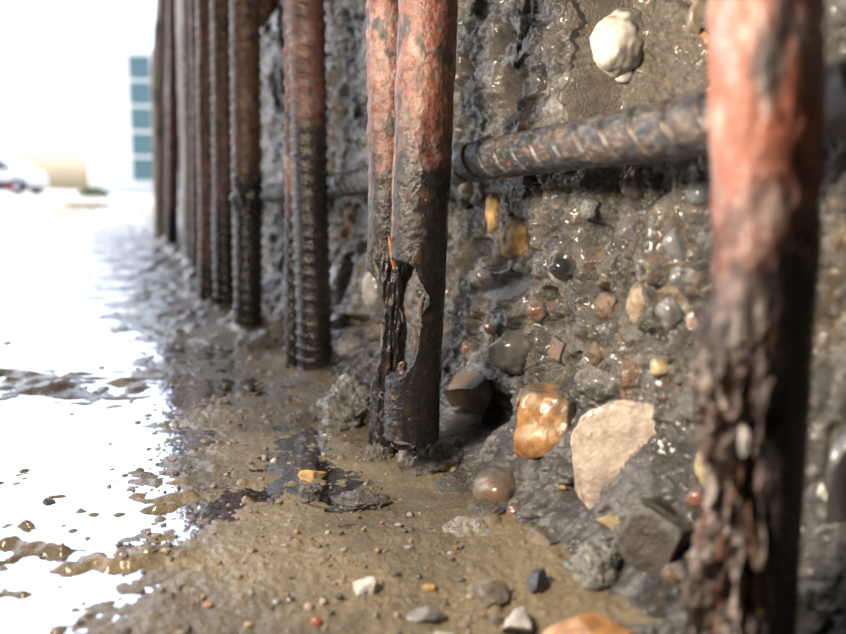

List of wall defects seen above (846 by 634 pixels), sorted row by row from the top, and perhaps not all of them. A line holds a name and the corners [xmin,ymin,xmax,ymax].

spalling [151,0,179,244]
spalling [181,0,846,634]